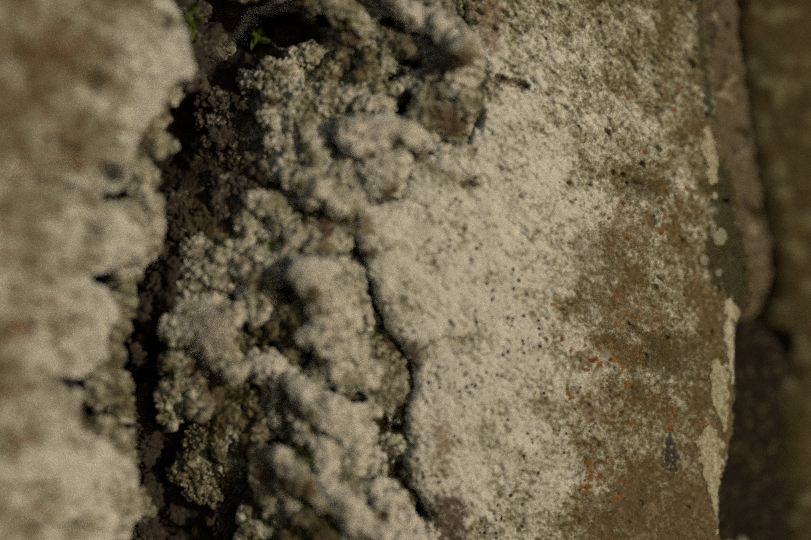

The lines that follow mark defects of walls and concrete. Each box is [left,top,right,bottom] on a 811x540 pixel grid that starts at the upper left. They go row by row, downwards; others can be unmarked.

water stain [421,489,474,540]
peeling [694,295,740,535]